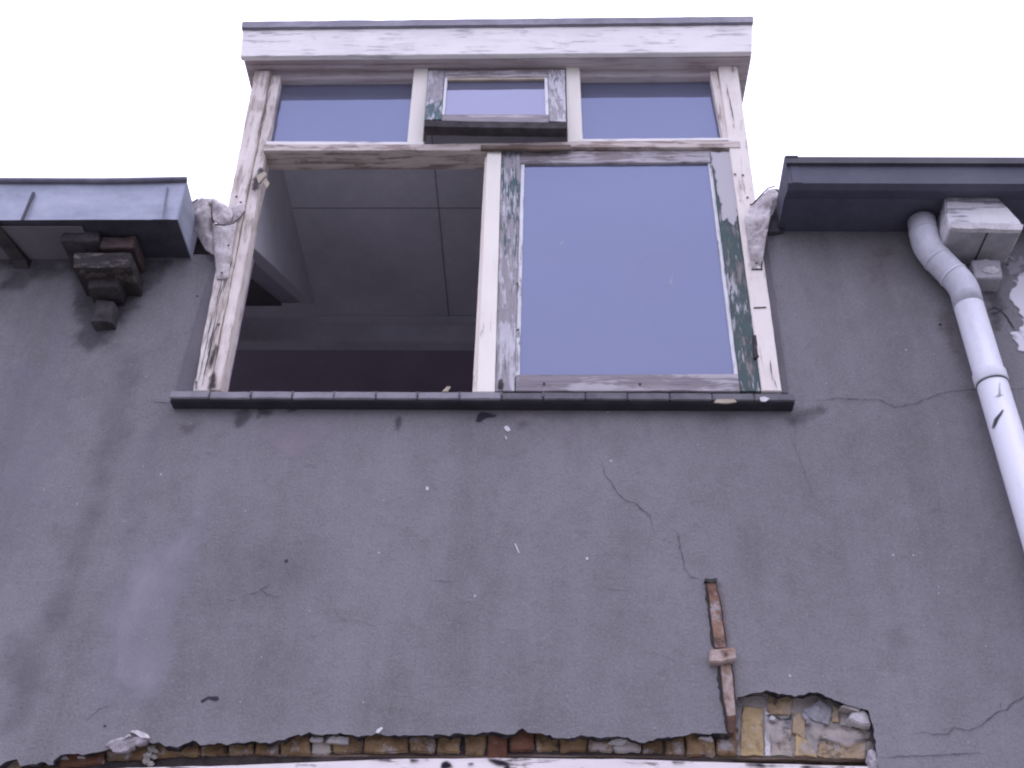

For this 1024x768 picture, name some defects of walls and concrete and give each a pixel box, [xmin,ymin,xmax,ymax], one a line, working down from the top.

peeling [1007,257,1024,351]
spalling [7,694,878,768]
crack [914,698,1022,757]